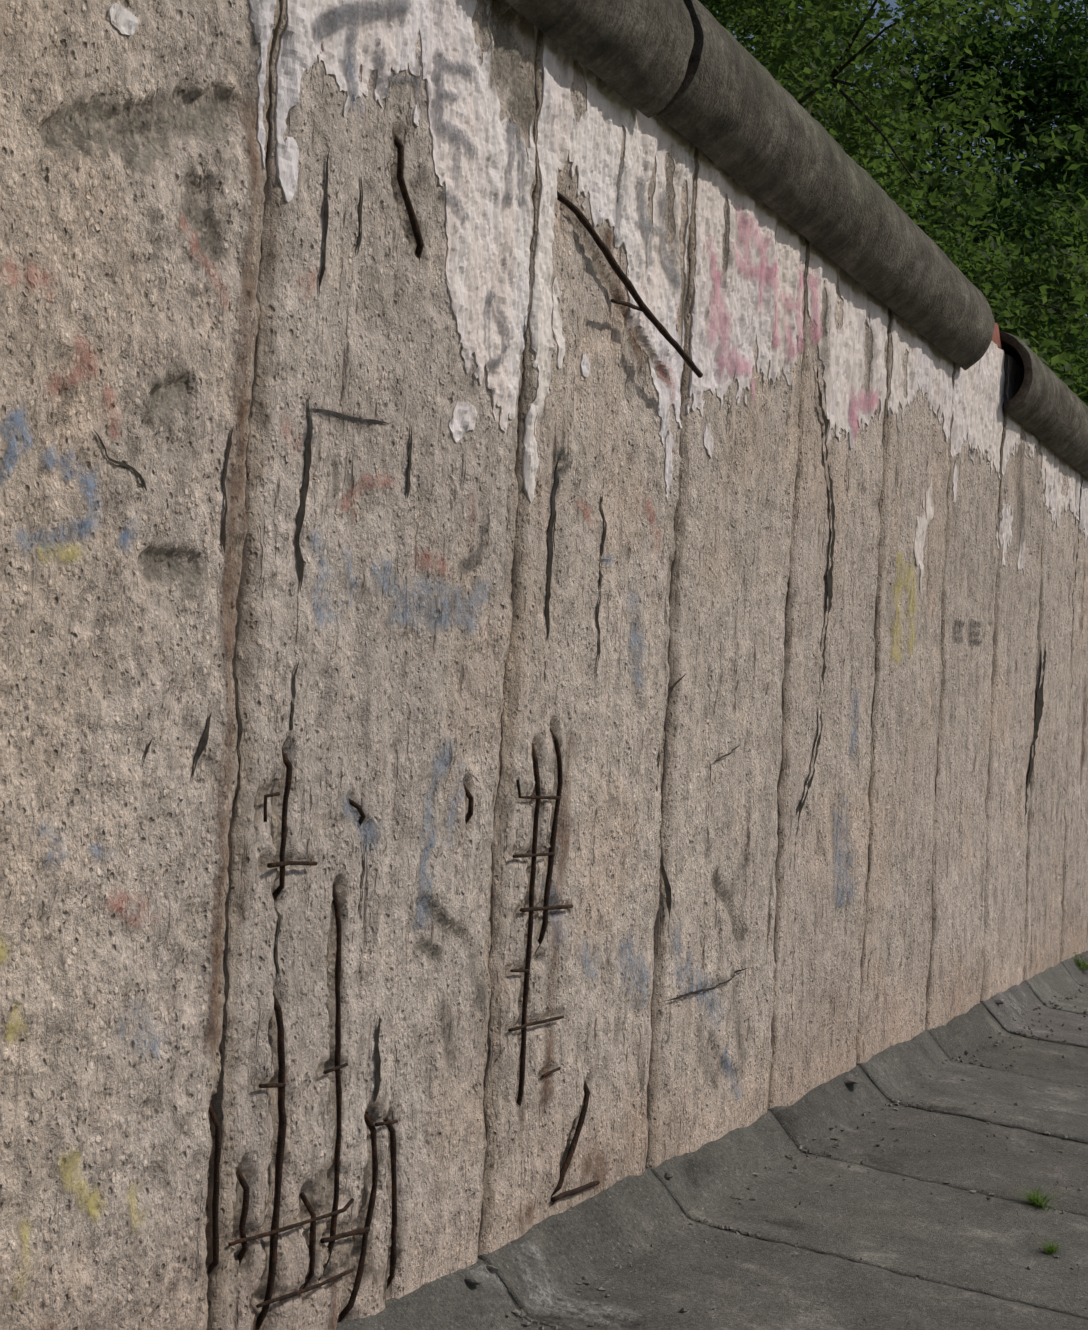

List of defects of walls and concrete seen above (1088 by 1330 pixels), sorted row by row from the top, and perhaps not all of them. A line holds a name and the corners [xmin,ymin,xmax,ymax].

peeling [108,3,139,36]
rust [224,231,254,662]
peeling [248,0,1088,575]
crack [794,353,835,868]
crack [869,683,877,797]
peeling [913,474,934,594]
crack [1025,476,1083,815]